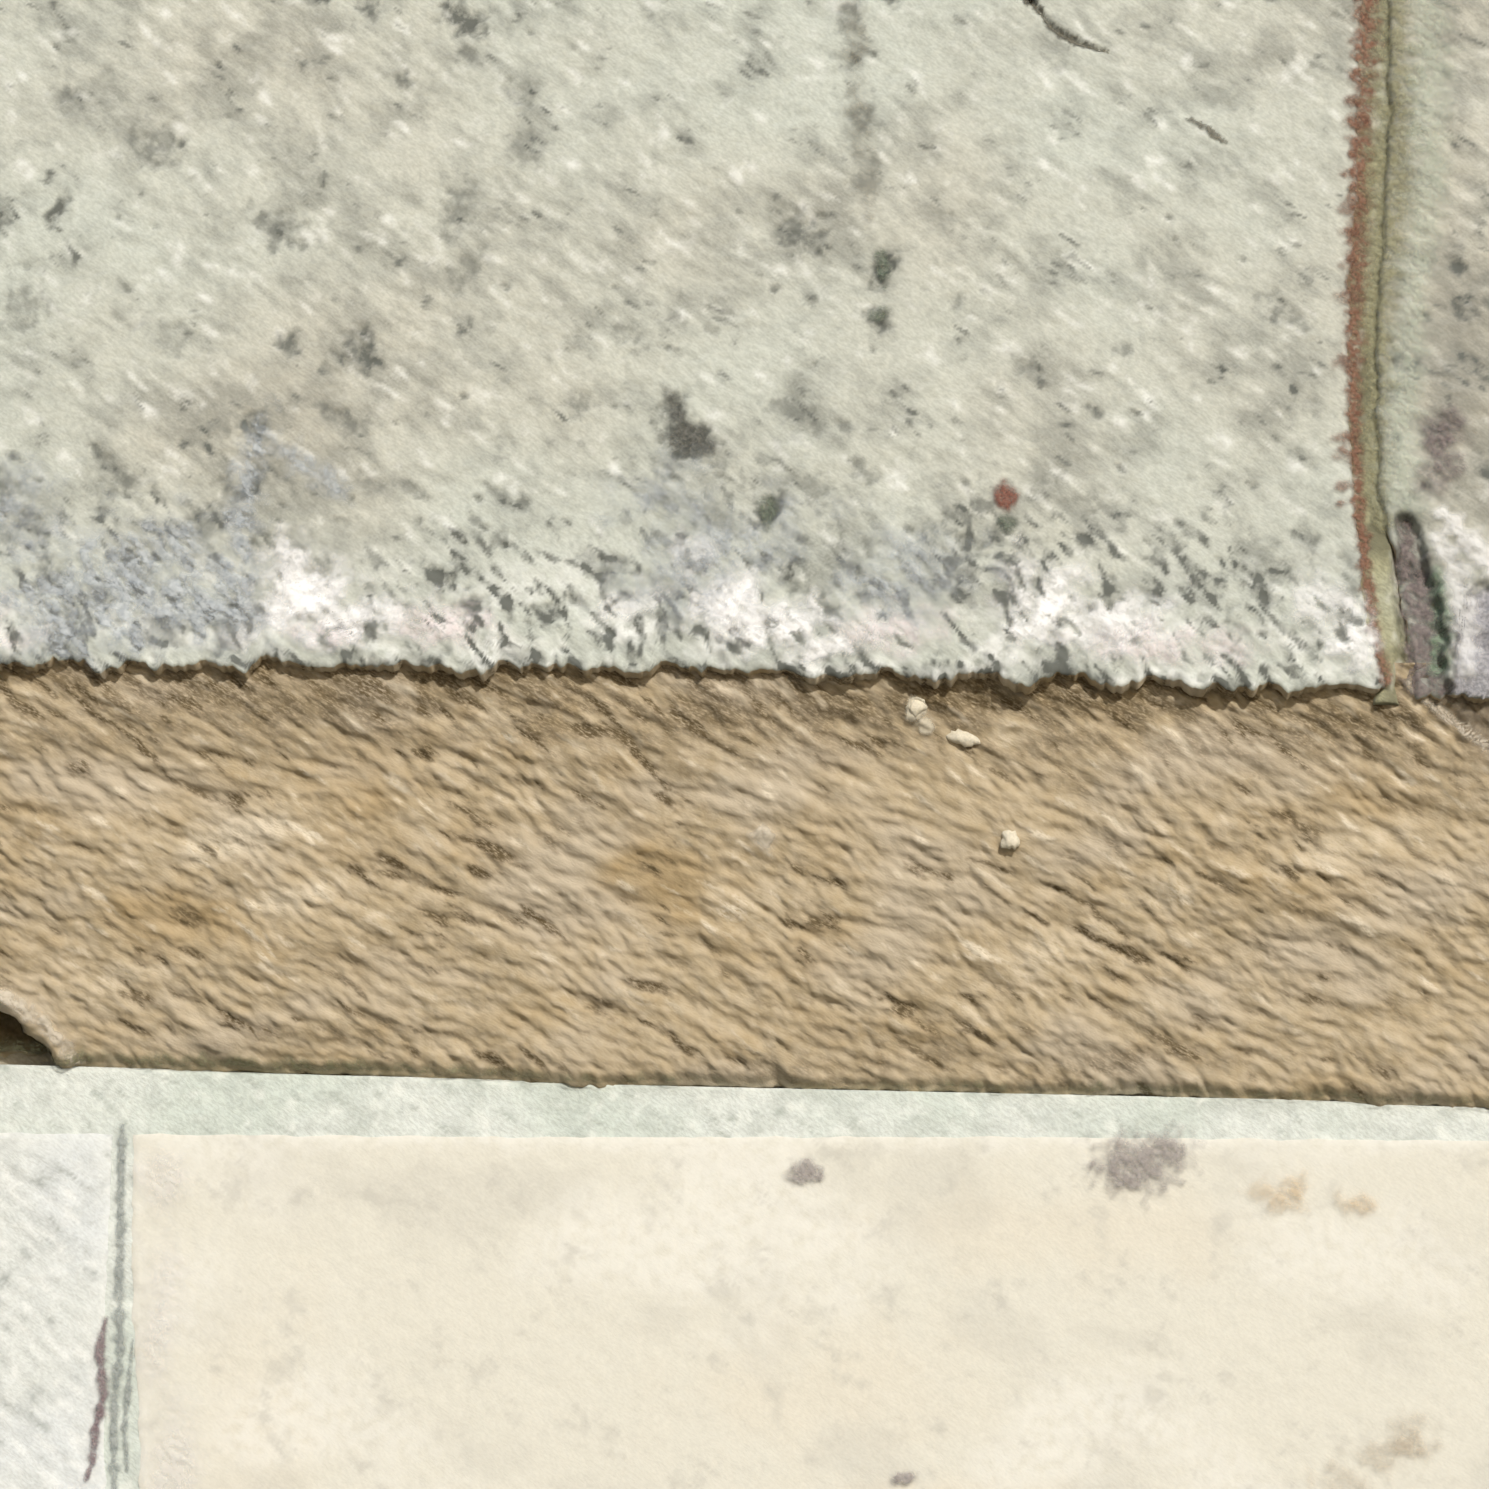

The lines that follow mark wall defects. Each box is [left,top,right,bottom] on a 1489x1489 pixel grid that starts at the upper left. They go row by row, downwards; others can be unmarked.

crack [1024,0,1108,53]
rust [1336,0,1393,684]
spalling [0,990,84,1064]